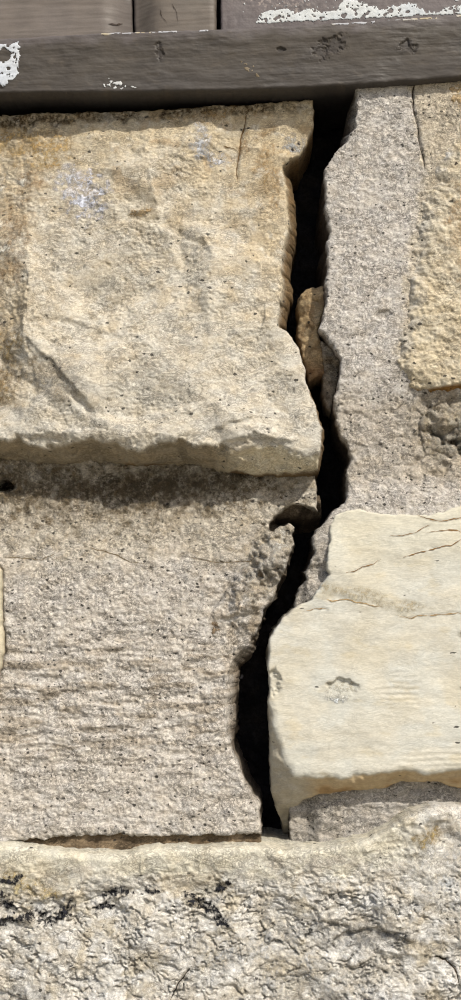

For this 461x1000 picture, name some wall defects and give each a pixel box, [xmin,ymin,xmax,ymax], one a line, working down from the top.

peeling [256,0,461,25]
peeling [0,42,21,86]
crack [225,116,246,179]
crack [287,128,344,344]
crack [236,386,461,829]